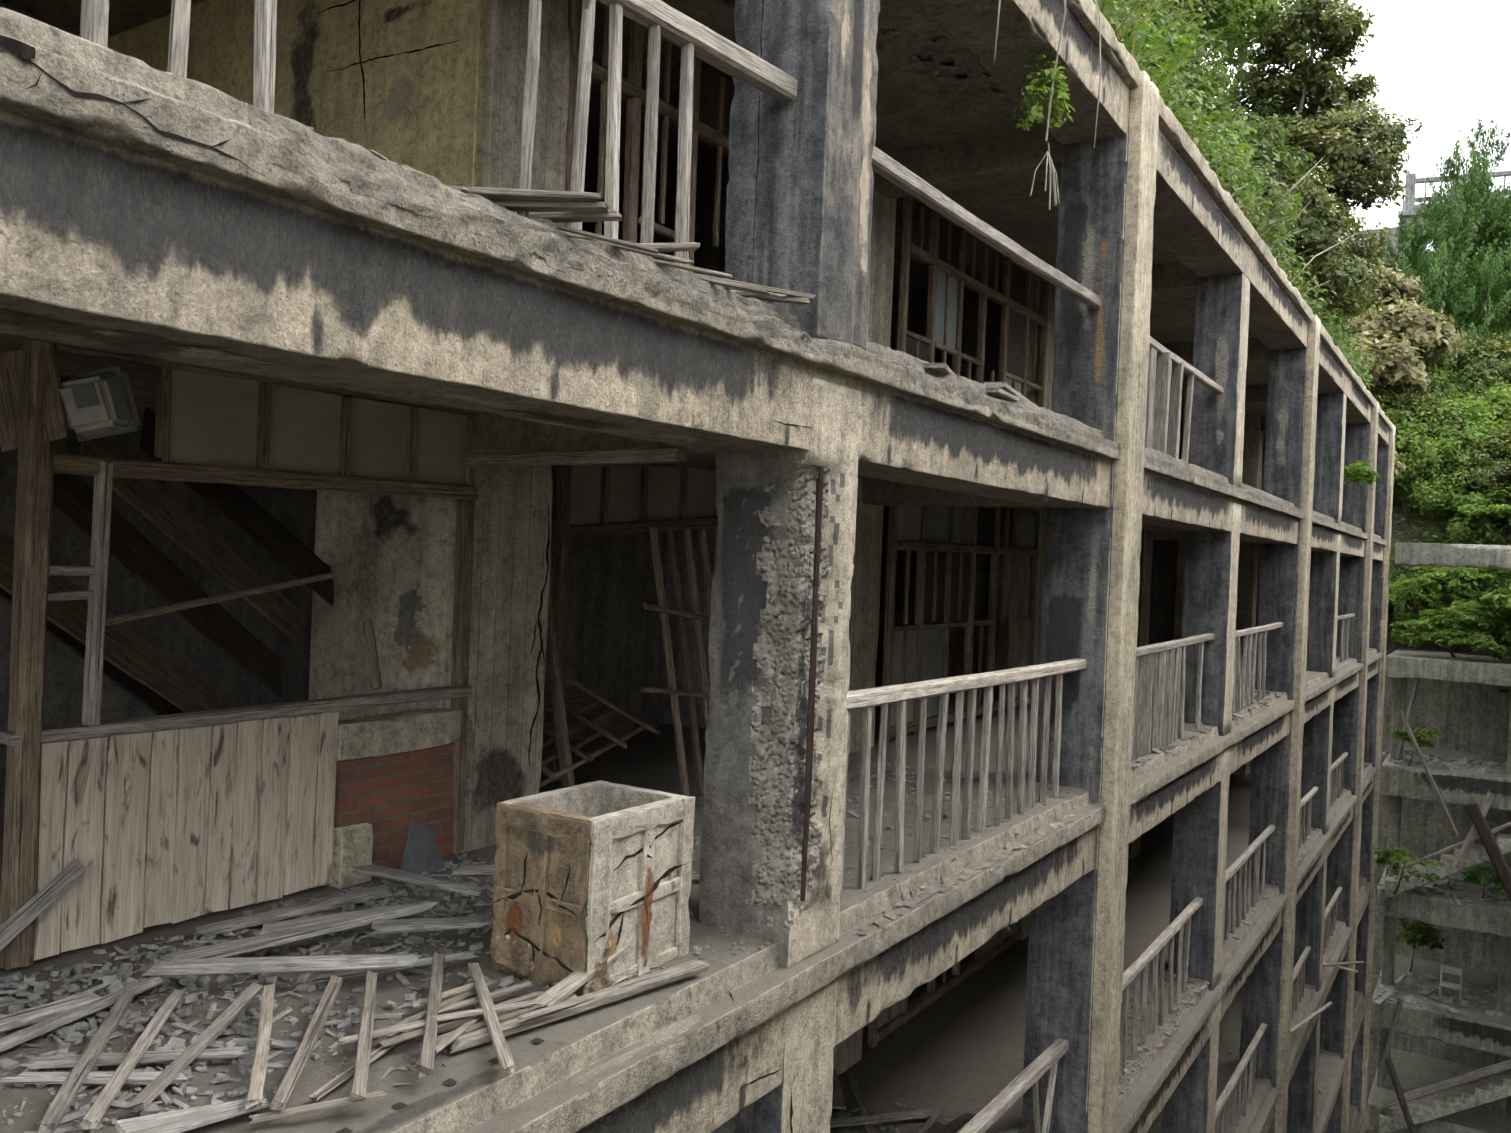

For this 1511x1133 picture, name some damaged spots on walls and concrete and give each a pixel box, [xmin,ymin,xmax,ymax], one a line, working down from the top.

crack [11,53,265,176]
crack [317,0,464,134]
spalling [922,376,1074,432]
leakage [373,496,416,538]
crack [528,503,550,767]
spalling [746,452,831,932]